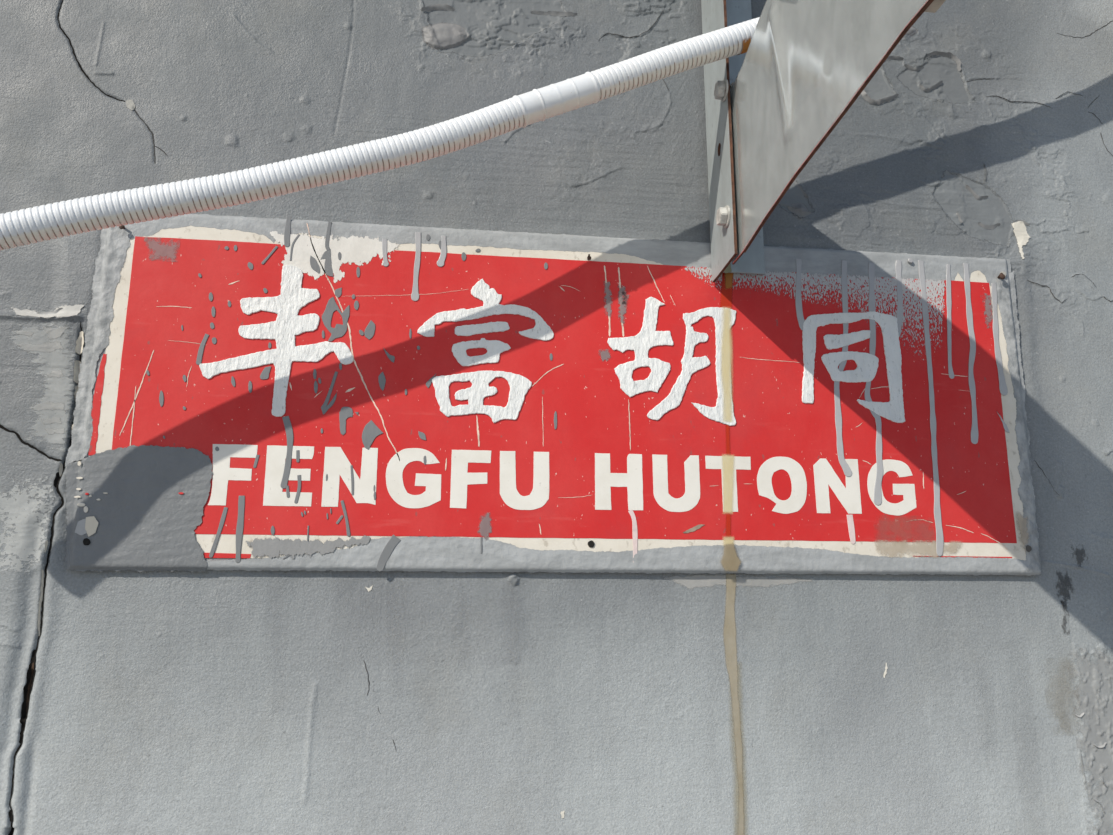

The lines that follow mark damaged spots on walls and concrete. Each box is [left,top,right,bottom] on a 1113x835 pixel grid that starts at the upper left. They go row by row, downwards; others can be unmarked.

crack [57,0,168,163]
peeling [860,56,904,105]
peeling [1011,220,1030,259]
crack [0,321,84,835]
rust [720,273,745,835]
damp [1056,573,1073,632]
spalling [1069,649,1113,835]